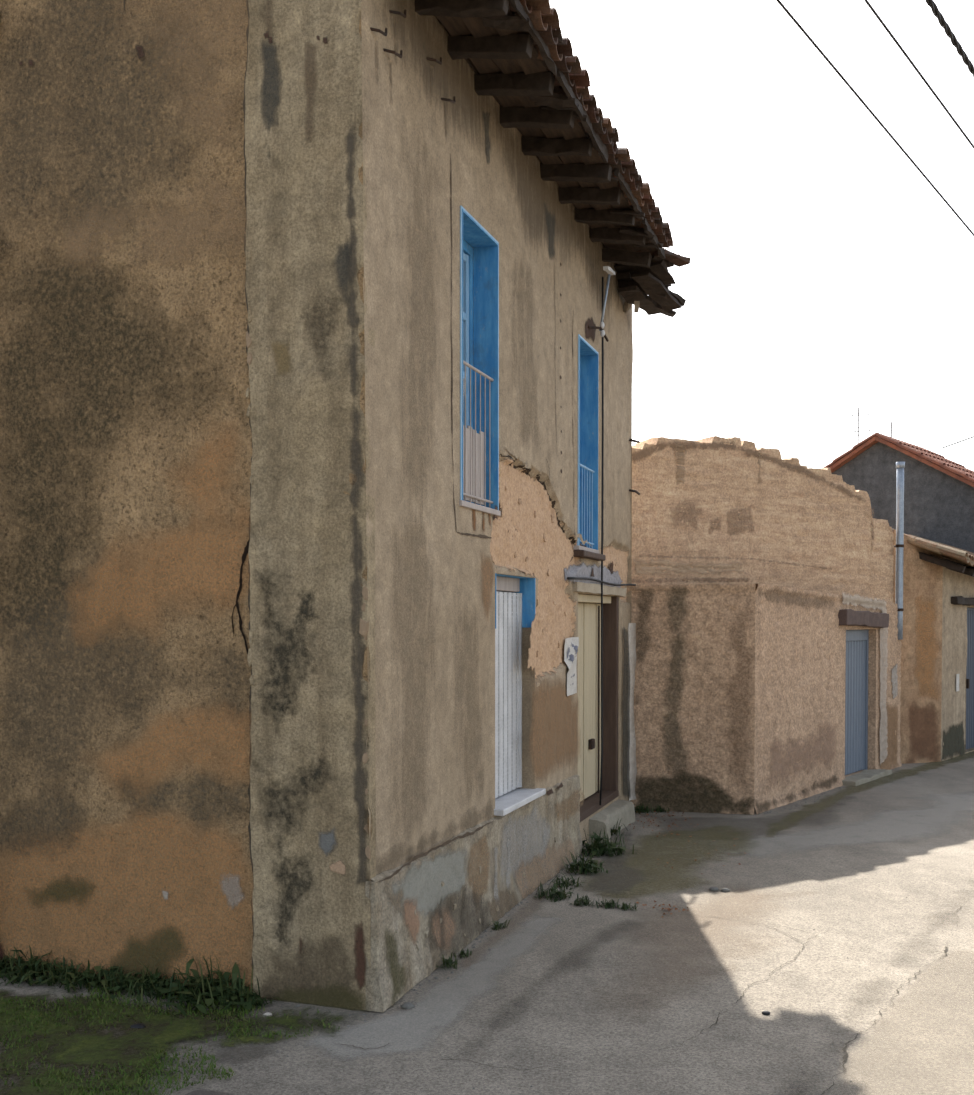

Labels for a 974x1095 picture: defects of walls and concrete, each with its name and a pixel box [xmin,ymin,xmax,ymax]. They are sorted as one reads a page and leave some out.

damp [262,44,280,125]
damp [336,132,359,331]
damp [1,266,192,771]
crack [231,0,260,967]
damp [350,411,435,883]
flaking render [490,459,629,679]
damp [623,589,837,815]
peeling [468,837,575,924]